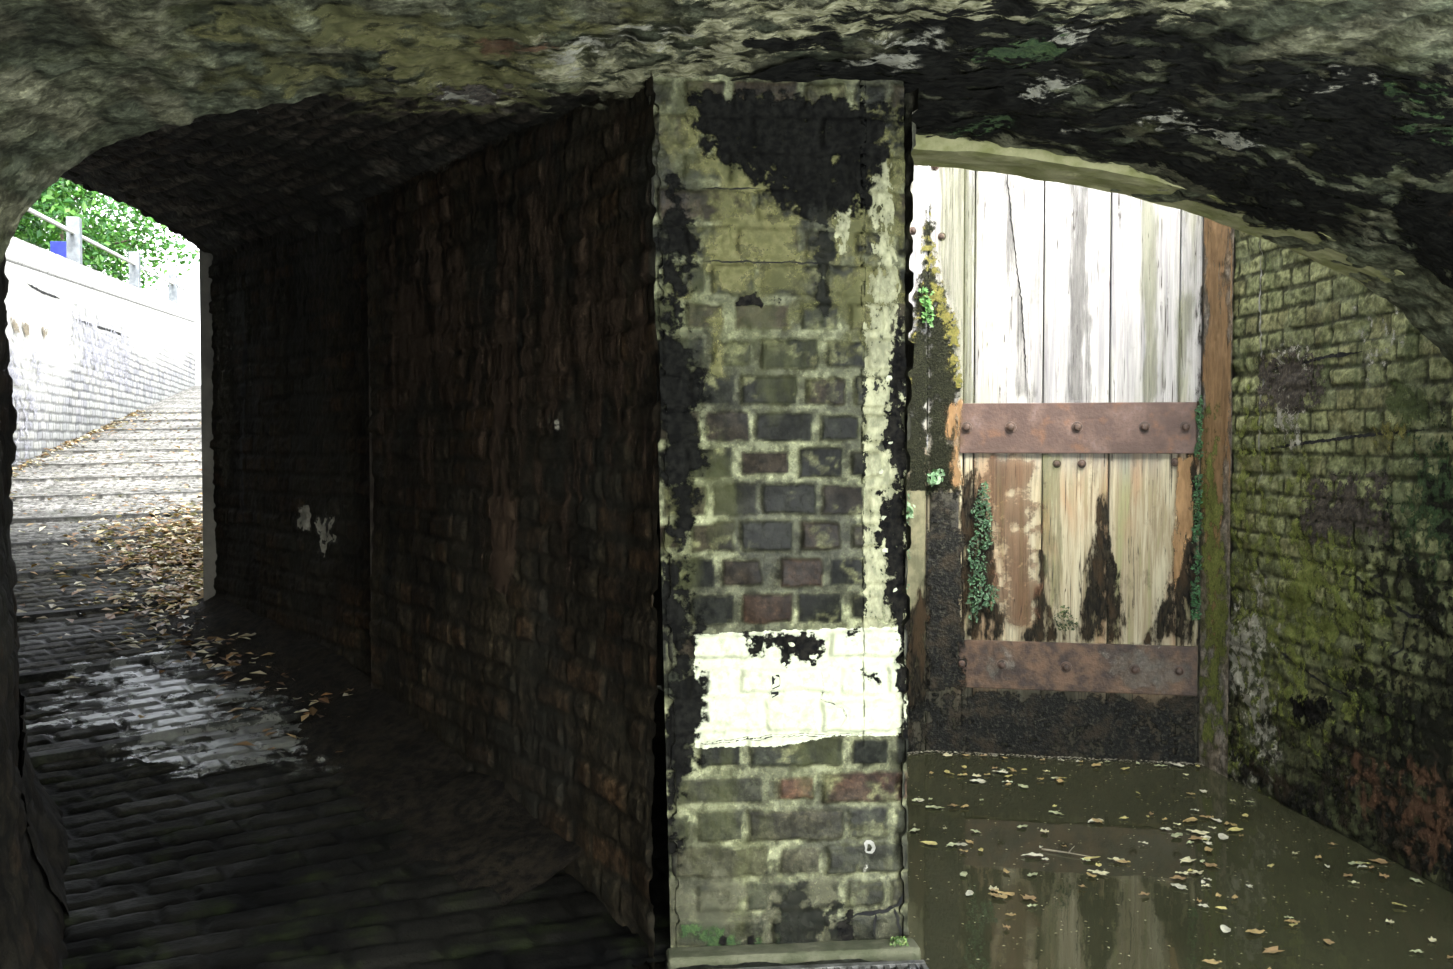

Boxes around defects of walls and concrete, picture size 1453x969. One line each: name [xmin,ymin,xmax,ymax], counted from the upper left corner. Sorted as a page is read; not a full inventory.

peeling [694,158,909,749]
damp [364,0,1453,595]
damp [906,367,1202,763]
damp [1228,393,1453,894]